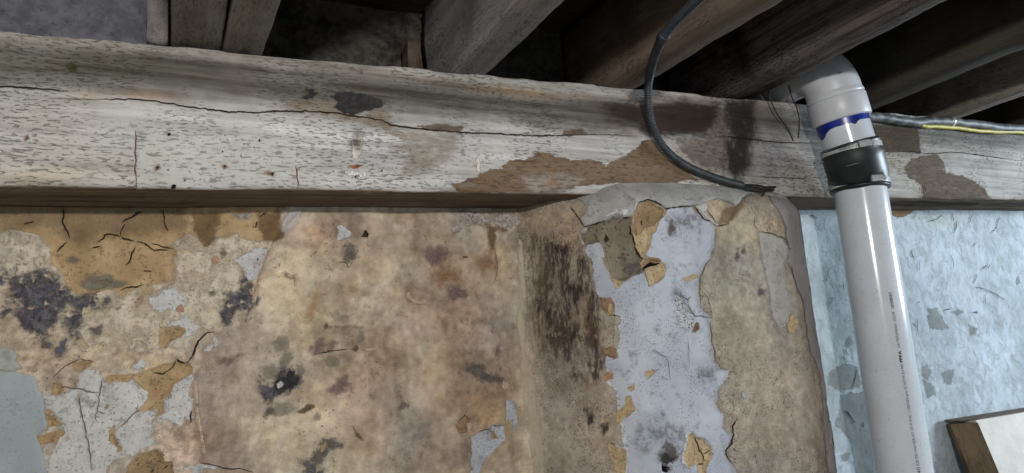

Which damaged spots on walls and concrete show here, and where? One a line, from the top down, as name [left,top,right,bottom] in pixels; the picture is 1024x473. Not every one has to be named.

water stain [873,124,992,208]
crack [56,209,70,253]
crack [93,210,173,290]
water stain [0,267,118,357]
crack [55,359,139,464]
spalling [0,207,282,473]
crack [155,332,211,375]
water stain [210,278,260,325]
water stain [257,337,320,420]
peeling [456,381,518,473]
water stain [527,234,602,383]
peeling [579,201,736,473]